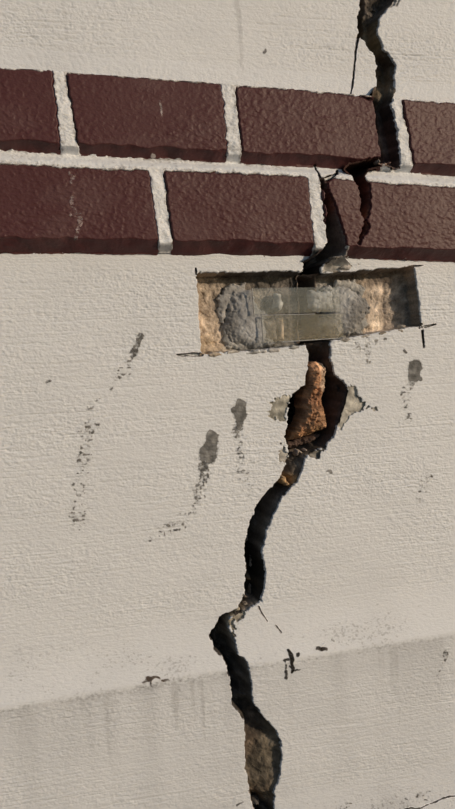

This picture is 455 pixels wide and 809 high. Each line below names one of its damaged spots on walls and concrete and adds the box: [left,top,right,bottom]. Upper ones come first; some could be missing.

flaking render [267,394,291,421]
crack [209,0,442,809]
flaking render [337,385,378,430]
water stain [159,462,209,536]
crack [403,795,455,809]